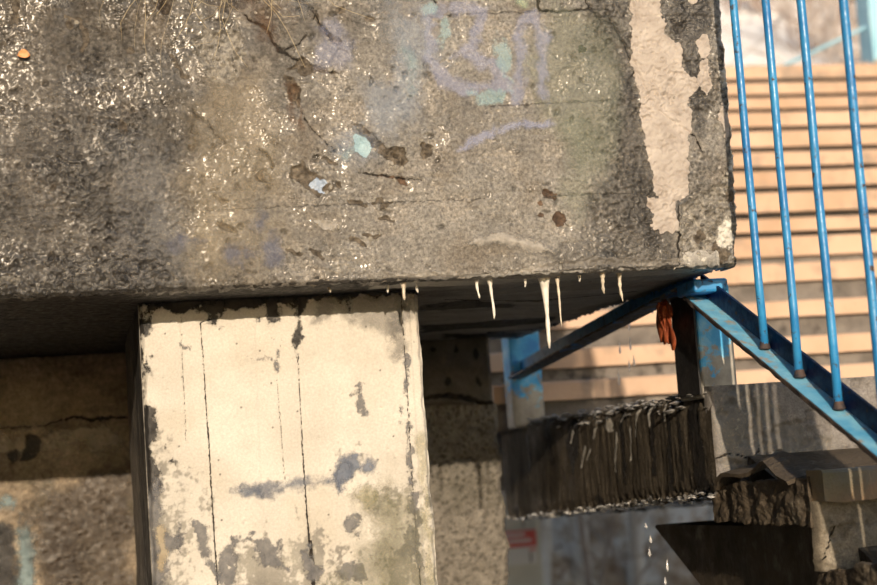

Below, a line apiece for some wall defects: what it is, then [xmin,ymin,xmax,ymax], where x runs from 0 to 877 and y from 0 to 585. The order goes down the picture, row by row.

crack [244,0,332,61]
crack [424,0,637,107]
crack [256,149,274,184]
crack [188,172,487,212]
spalling [353,124,411,189]
damp [716,215,735,250]
damp [0,218,715,378]
damp [143,391,162,495]
damp [25,464,135,585]
peeling [148,478,183,585]
peeling [192,520,291,585]
peeling [394,422,425,569]